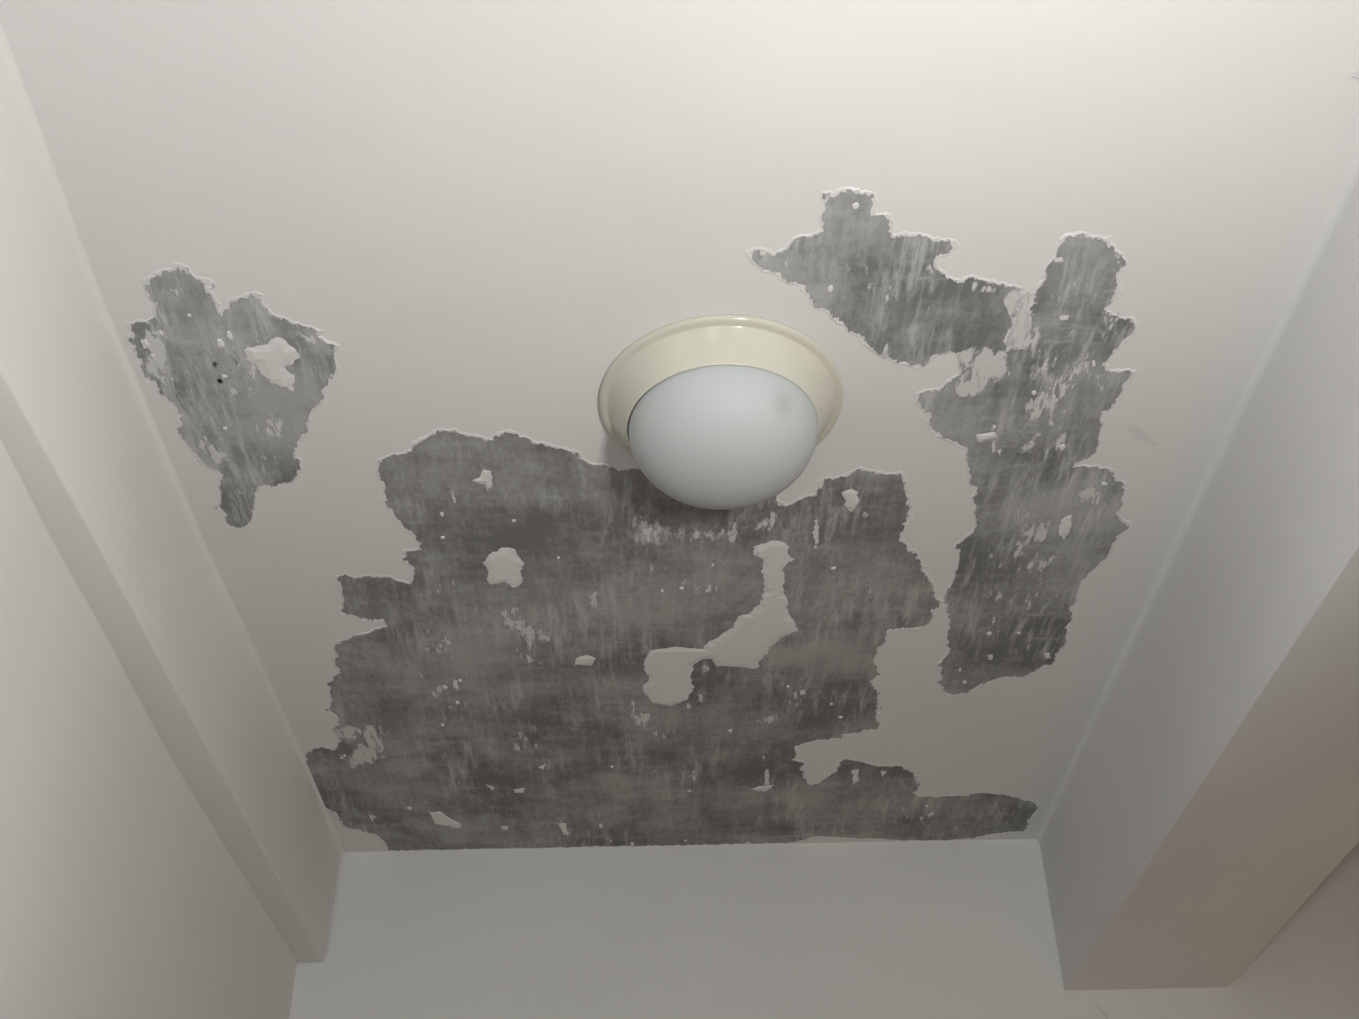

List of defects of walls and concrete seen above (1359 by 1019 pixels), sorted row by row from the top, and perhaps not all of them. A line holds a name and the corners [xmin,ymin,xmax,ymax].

peeling [124,262,341,530]
peeling [305,186,1139,851]